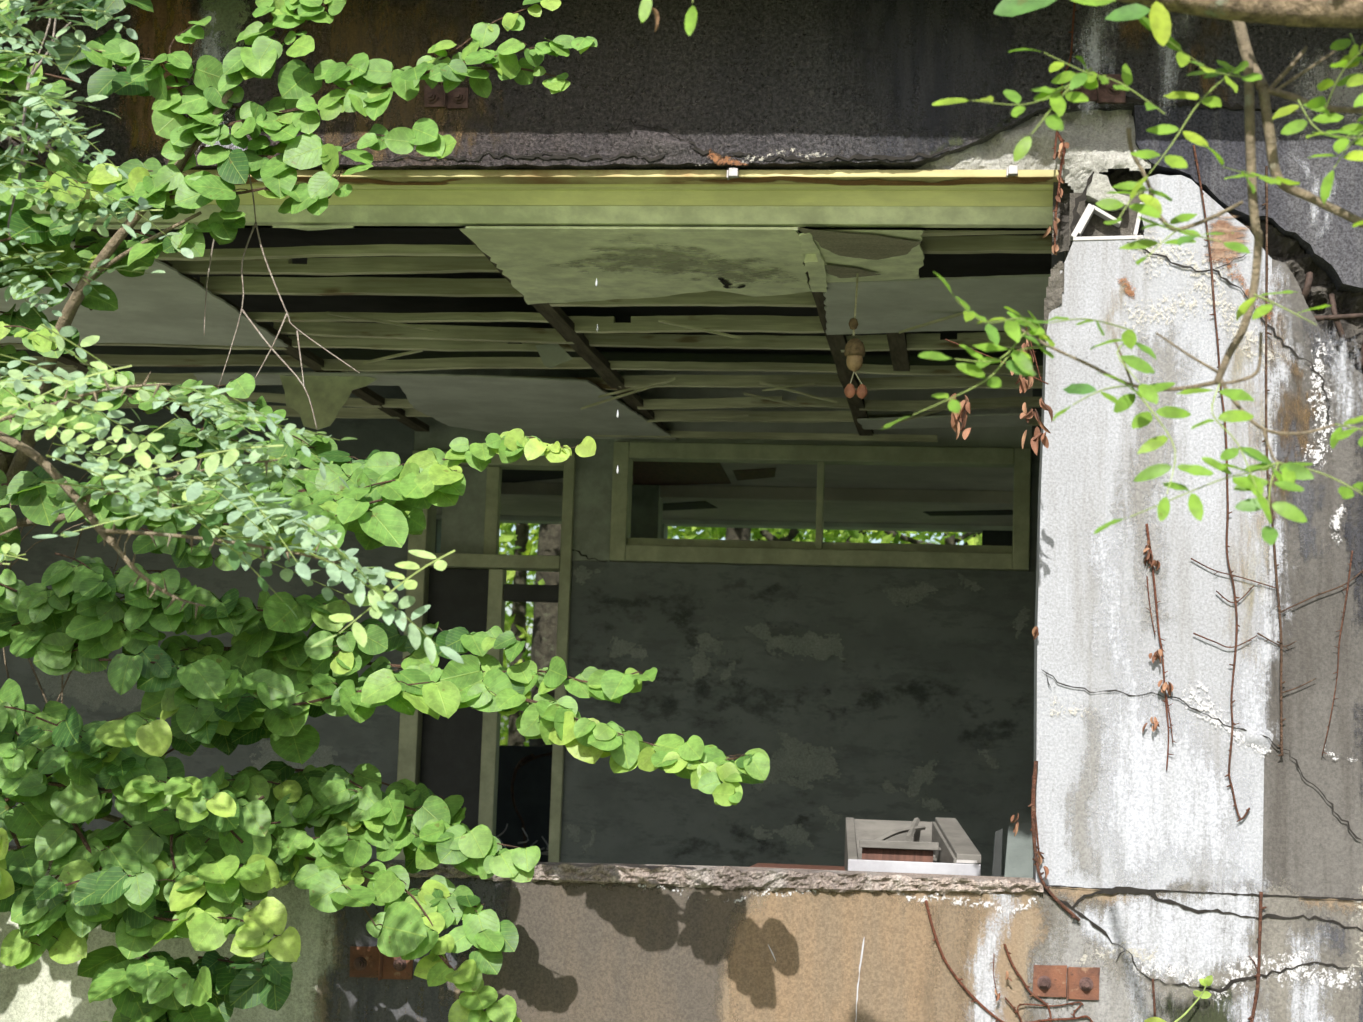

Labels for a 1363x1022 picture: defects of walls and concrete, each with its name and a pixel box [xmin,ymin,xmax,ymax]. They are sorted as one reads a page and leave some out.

corrosion [118,0,202,156]
spalling [1044,261,1064,334]
spalling [1242,220,1363,374]
water stain [898,230,1363,1022]
crack [1041,669,1362,840]
crack [1043,885,1363,993]